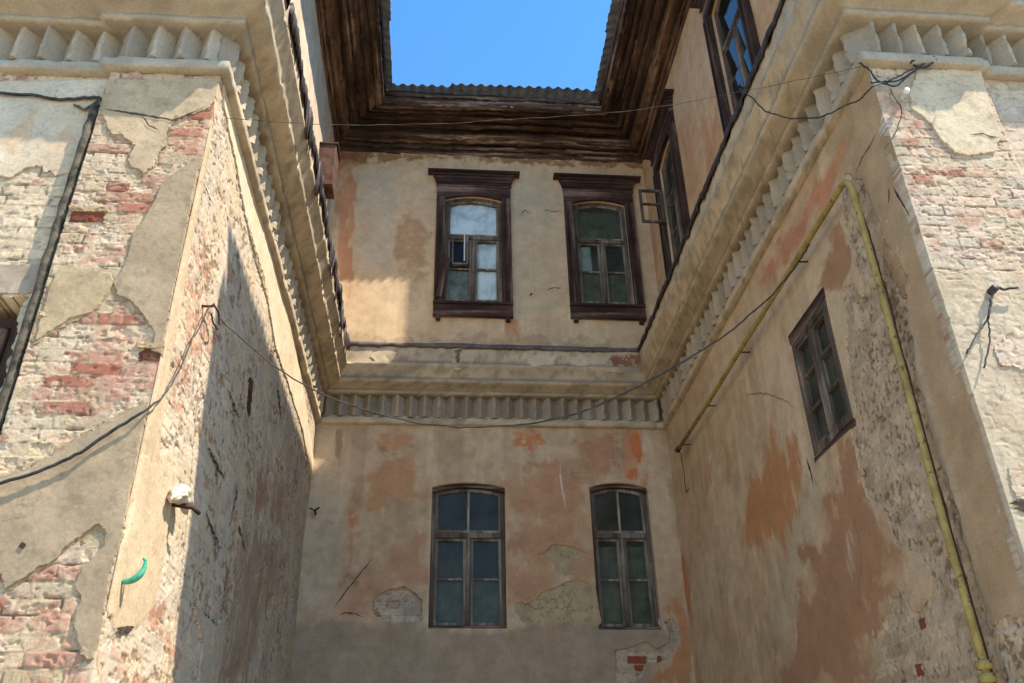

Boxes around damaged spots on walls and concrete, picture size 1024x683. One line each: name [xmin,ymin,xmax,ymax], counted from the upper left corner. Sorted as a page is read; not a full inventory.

crack [108,105,207,129]
peeling [877,69,1002,192]
crack [888,189,910,216]
peeling [0,76,314,683]
spalling [839,162,1024,683]
crack [331,556,374,618]
spalling [372,587,422,624]
spalling [615,618,680,683]